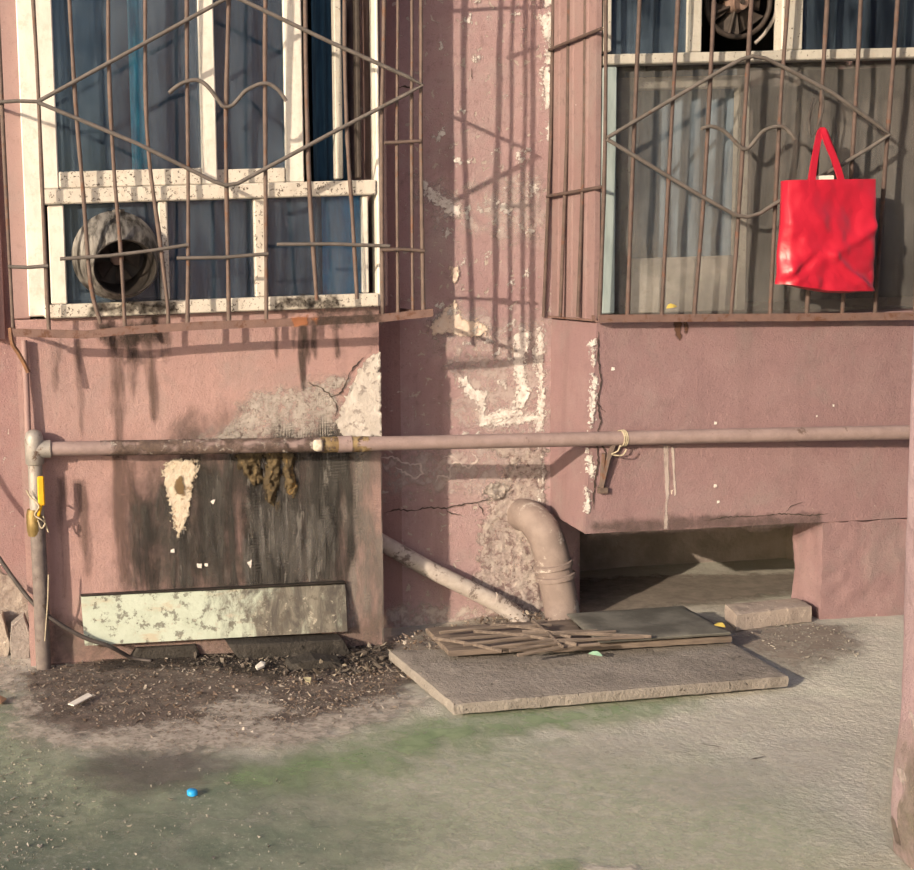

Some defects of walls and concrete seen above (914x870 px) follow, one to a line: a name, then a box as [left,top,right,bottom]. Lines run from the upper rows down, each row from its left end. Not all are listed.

peeling [538,0,551,110]
peeling [423,180,535,234]
damp [97,317,168,401]
damp [218,325,348,439]
peeling [335,352,382,437]
peeling [586,338,599,432]
damp [77,483,87,553]
peeling [161,458,200,538]
damp [113,451,476,647]
crack [386,499,487,515]
peeling [582,447,597,514]
damp [50,624,233,662]